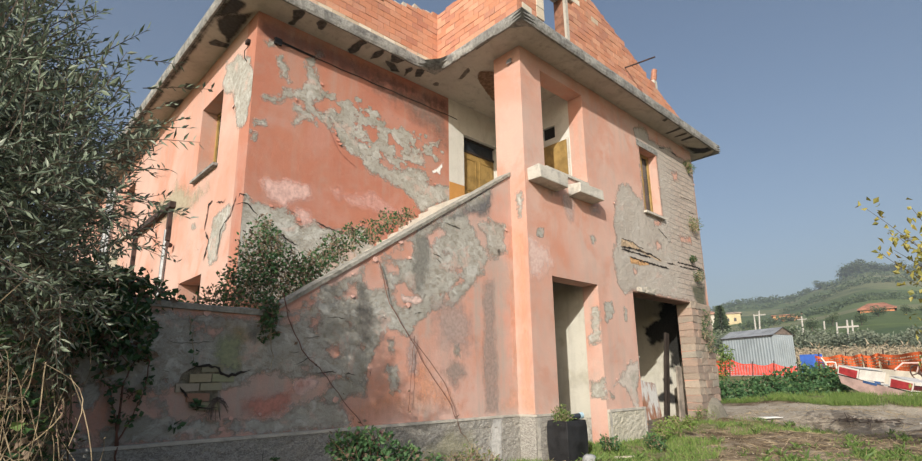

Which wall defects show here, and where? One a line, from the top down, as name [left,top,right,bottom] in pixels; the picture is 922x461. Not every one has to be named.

spalling [209,39,229,48]
spalling [165,83,195,109]
peeling [222,39,449,213]
flaking render [612,126,707,323]
peeling [65,187,508,448]
peeling [588,301,627,345]
crack [162,340,250,410]
peeling [590,360,639,407]